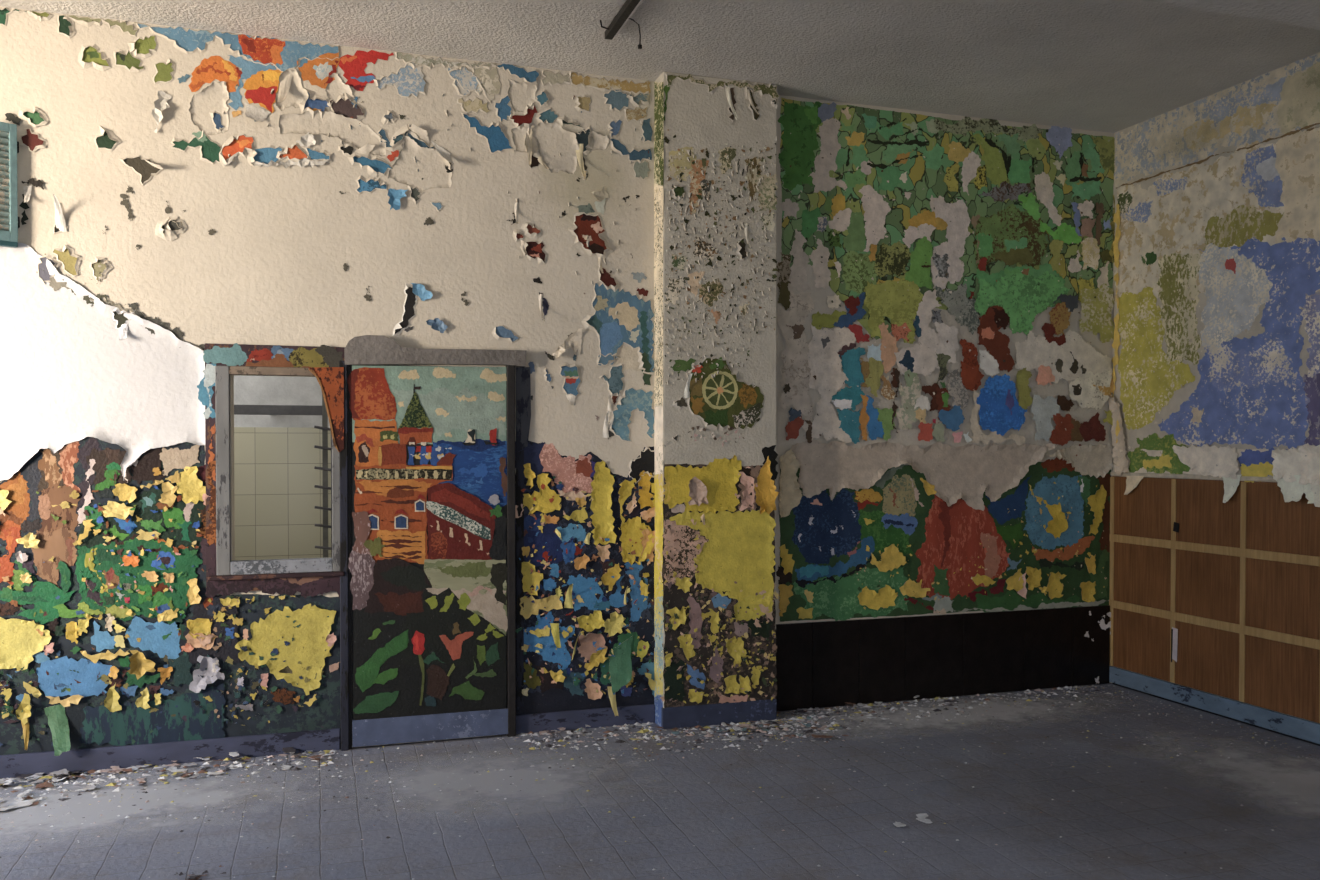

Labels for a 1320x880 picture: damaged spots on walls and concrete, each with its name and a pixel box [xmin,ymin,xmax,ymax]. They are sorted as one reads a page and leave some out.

crack [1116,123,1320,189]
peeling [0,7,1144,756]
peeling [1172,430,1241,503]
peeling [1271,427,1320,507]